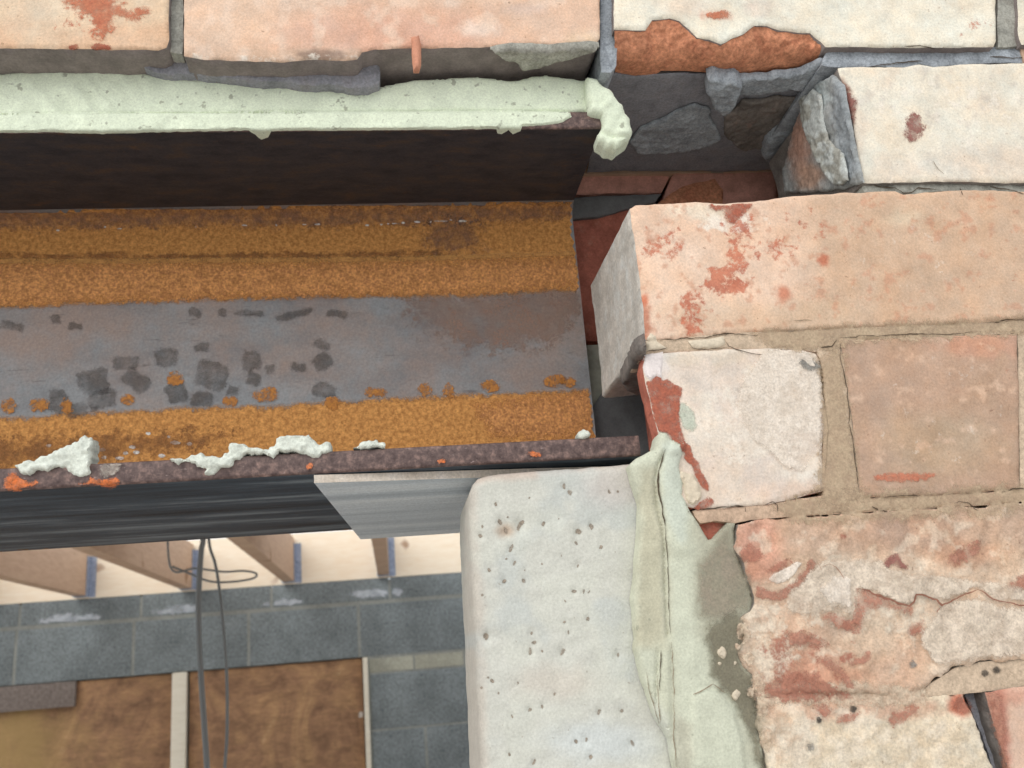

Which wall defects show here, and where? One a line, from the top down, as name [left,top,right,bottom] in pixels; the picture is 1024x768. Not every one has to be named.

spalling [614,19,821,76]
corrosion [0,201,579,308]
corrosion [167,371,184,386]
corrosion [0,374,596,469]
water stain [699,531,772,768]
peeling [765,630,871,723]
peeling [755,540,1024,677]
peeling [888,705,919,728]
crack [817,561,1024,612]
peeling [987,692,1008,768]